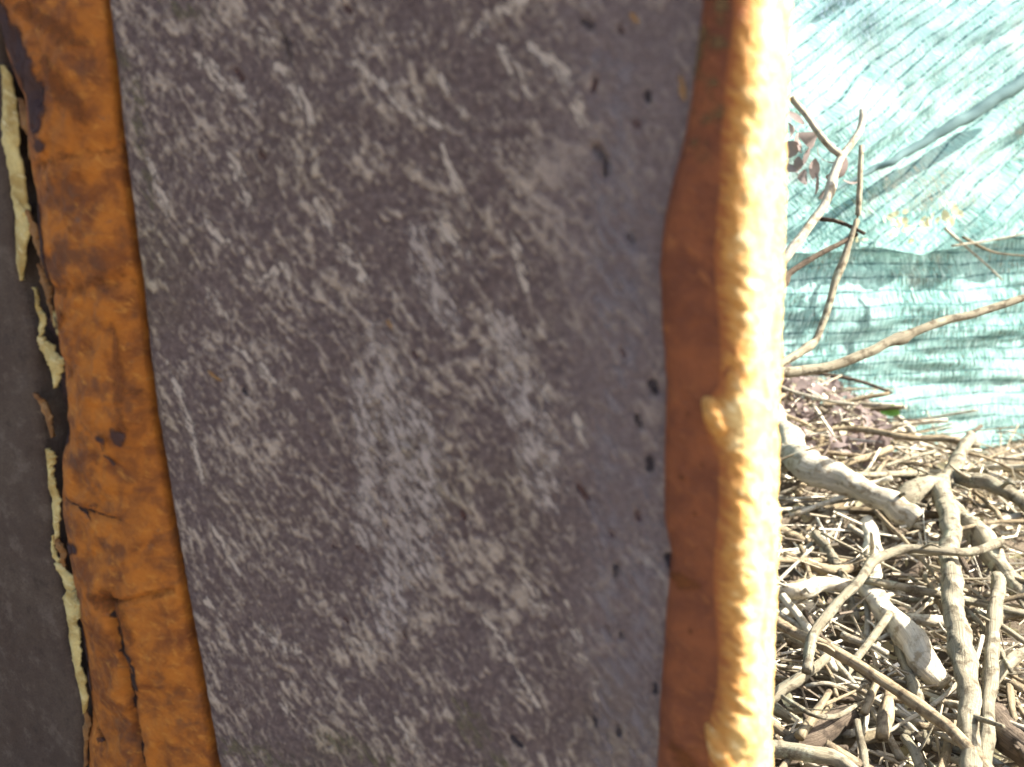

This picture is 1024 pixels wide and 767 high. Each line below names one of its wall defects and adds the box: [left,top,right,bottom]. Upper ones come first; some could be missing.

peeling [0,65,65,388]
peeling [33,392,92,767]
crack [66,498,122,521]
crack [111,594,138,709]